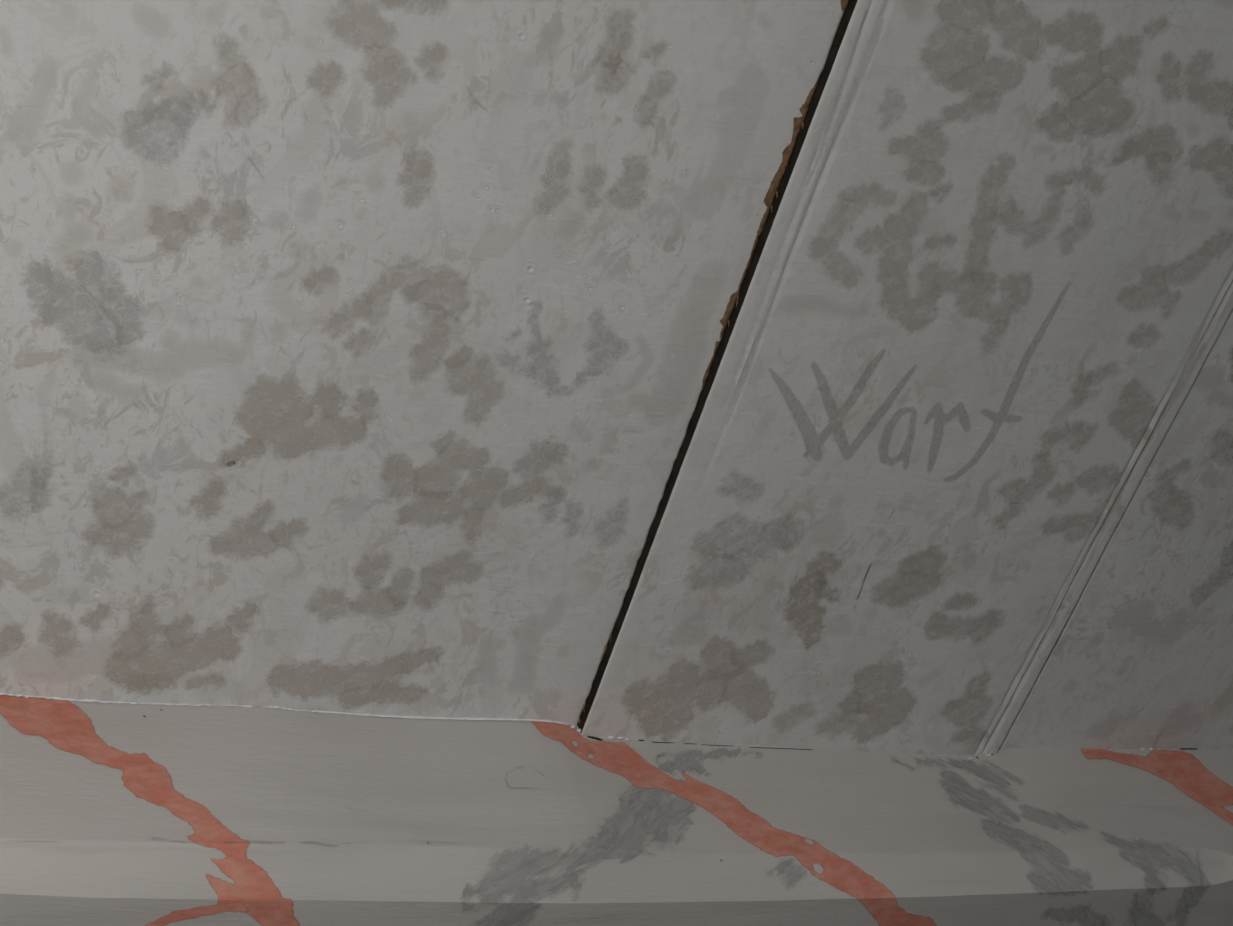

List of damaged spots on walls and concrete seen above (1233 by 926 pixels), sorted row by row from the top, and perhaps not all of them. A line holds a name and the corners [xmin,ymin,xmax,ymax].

damp [223,377,376,464]
damp [107,603,259,690]
damp [269,649,438,707]
crack [638,740,813,750]